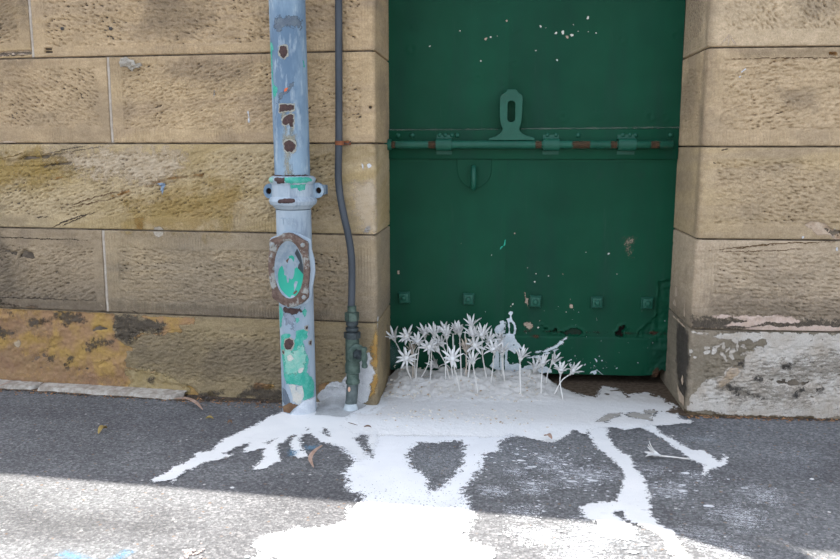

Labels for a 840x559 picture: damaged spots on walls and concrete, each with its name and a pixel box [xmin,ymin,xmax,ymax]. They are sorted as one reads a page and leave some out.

corrosion [279,104,294,127]
crack [0,146,104,177]
corrosion [284,140,296,152]
peeling [687,314,840,419]